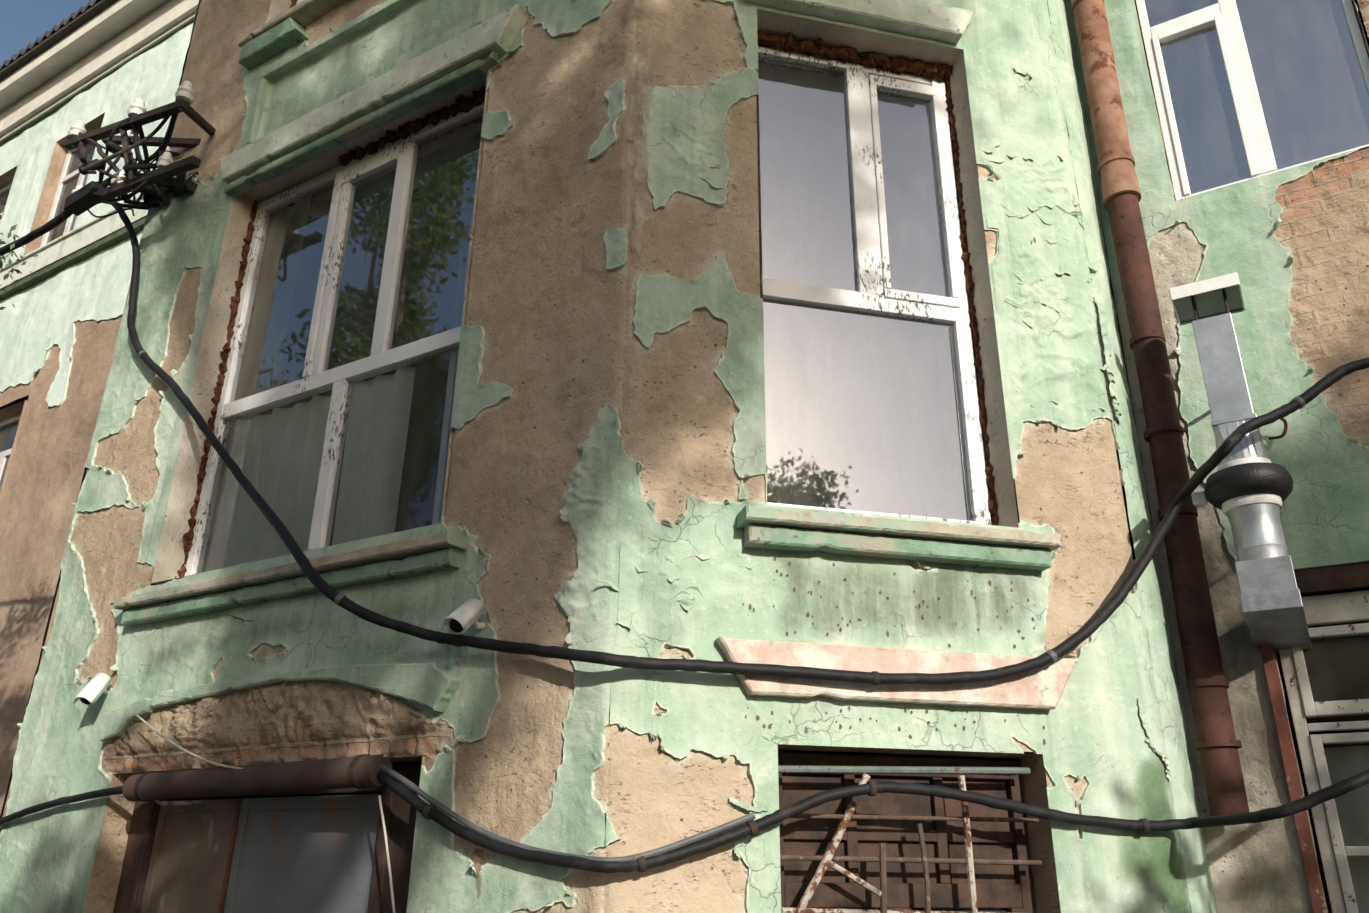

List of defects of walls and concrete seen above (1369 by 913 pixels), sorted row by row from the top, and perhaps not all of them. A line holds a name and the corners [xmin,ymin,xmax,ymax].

peeling [1357,0,1369,37]
peeling [1273,148,1369,447]
peeling [0,267,202,834]
peeling [102,0,765,877]
spalling [774,556,862,636]
peeling [967,418,1136,659]
peeling [512,703,754,913]
crack [1137,698,1172,780]